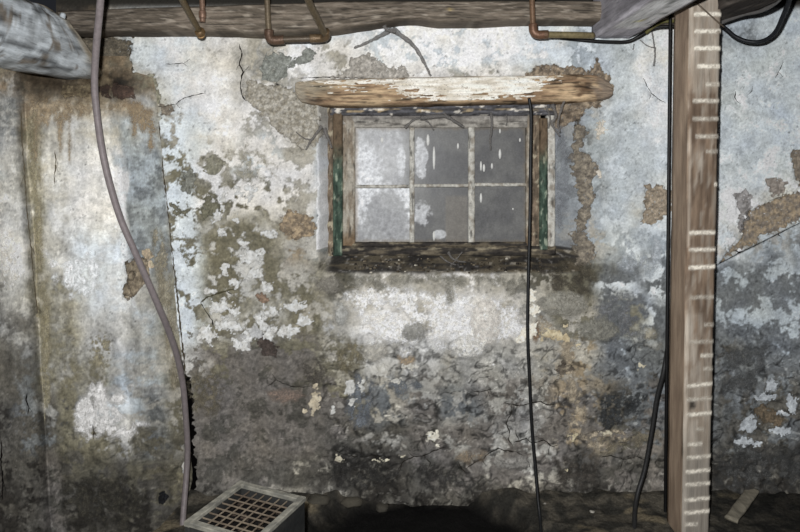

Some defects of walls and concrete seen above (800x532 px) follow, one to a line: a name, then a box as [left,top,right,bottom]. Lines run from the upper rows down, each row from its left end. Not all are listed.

crack [236,44,248,101]
peeling [169,154,258,237]
peeling [241,46,614,266]
spalling [722,149,800,262]
damp [27,94,100,417]
crack [158,93,204,490]
crack [201,289,234,325]
peeling [196,240,314,358]
crack [335,435,446,484]
crack [458,388,557,473]
damp [599,392,645,430]
peeling [734,414,793,448]